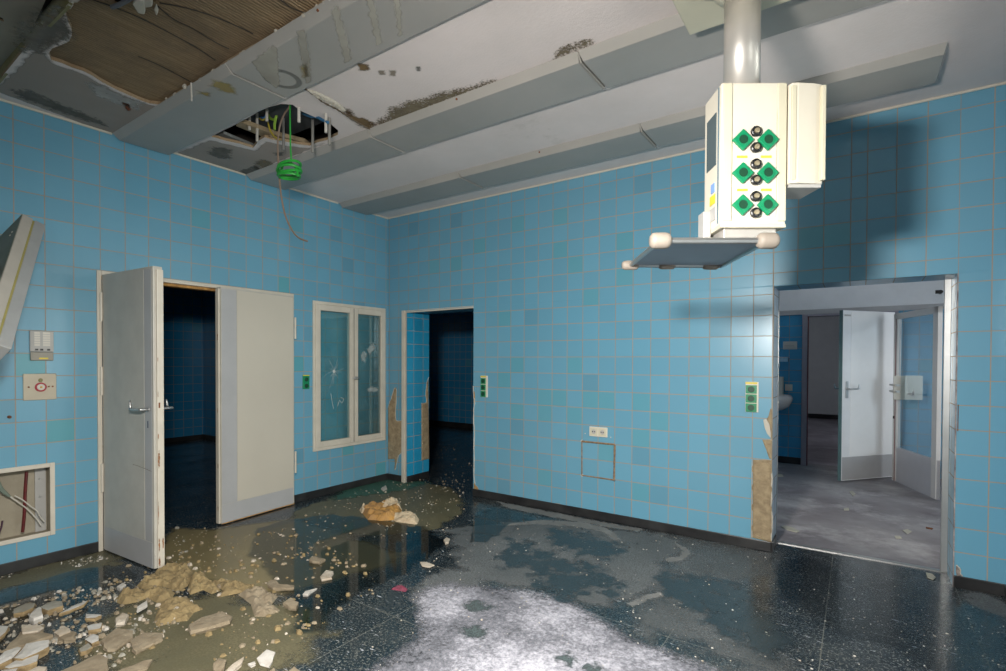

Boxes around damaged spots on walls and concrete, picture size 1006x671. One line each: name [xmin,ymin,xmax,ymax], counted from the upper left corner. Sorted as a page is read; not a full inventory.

spalling [388,388,401,470]
spalling [421,377,429,461]
spalling [751,408,773,542]
damp [374,501,796,671]